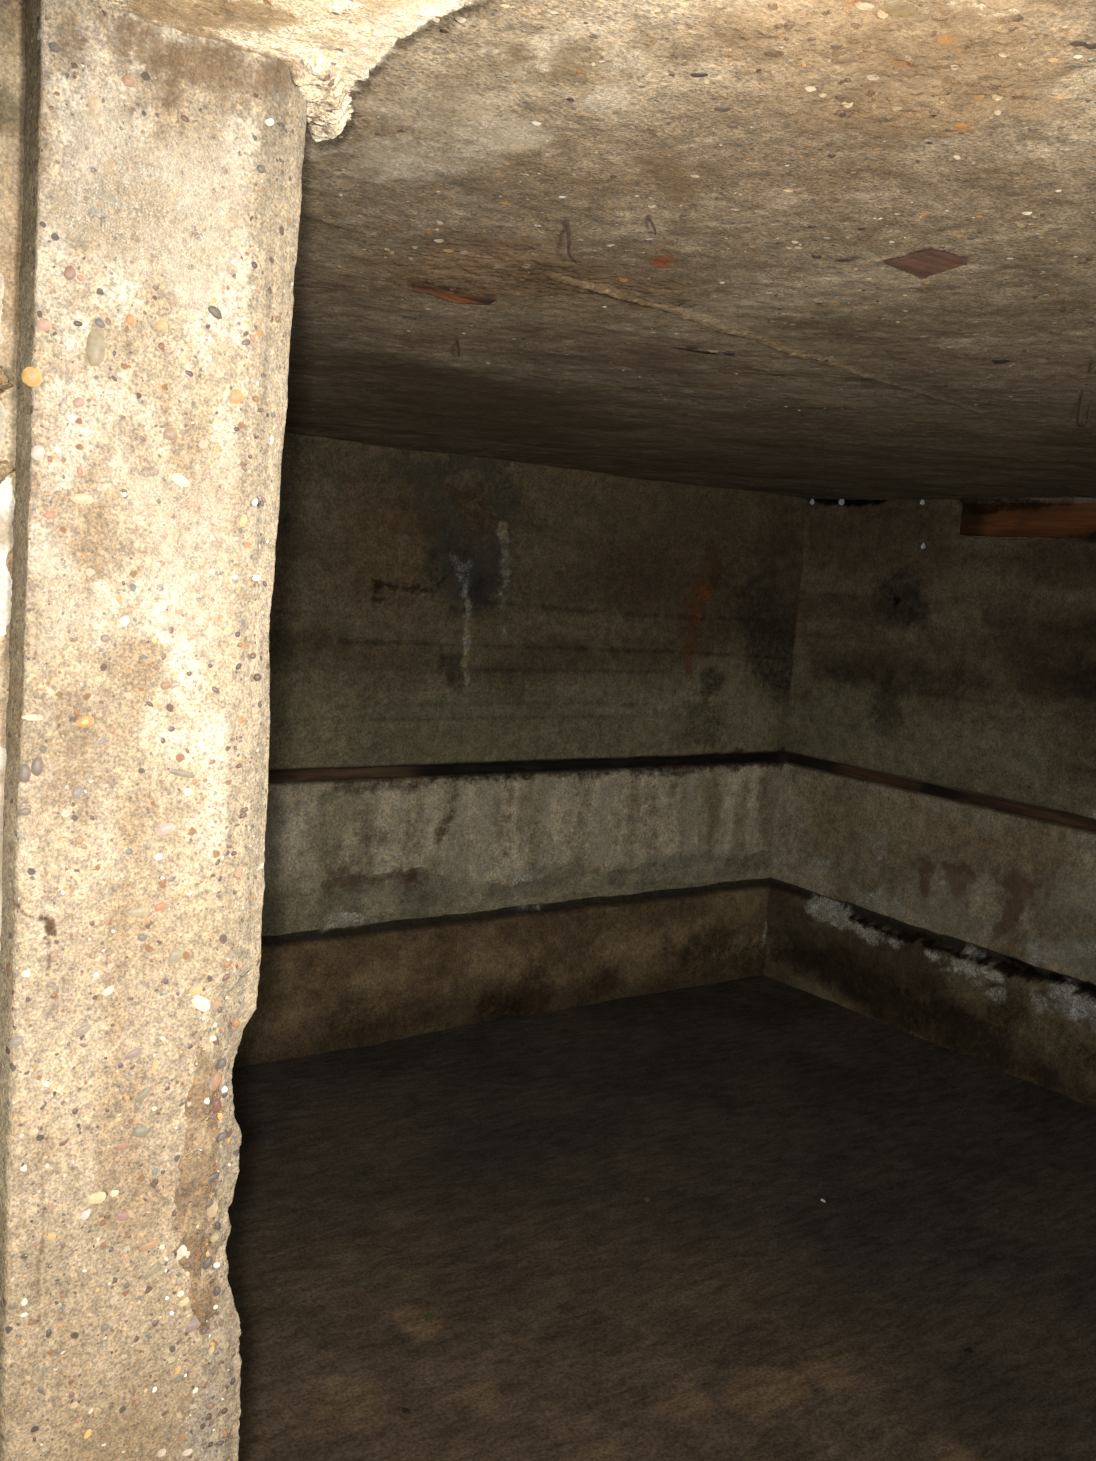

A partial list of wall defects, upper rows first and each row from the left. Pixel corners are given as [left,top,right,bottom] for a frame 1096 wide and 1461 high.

water stain [101,0,298,117]
flaking render [0,365,16,636]
flaking render [0,746,56,950]
water stain [664,874,1096,1089]